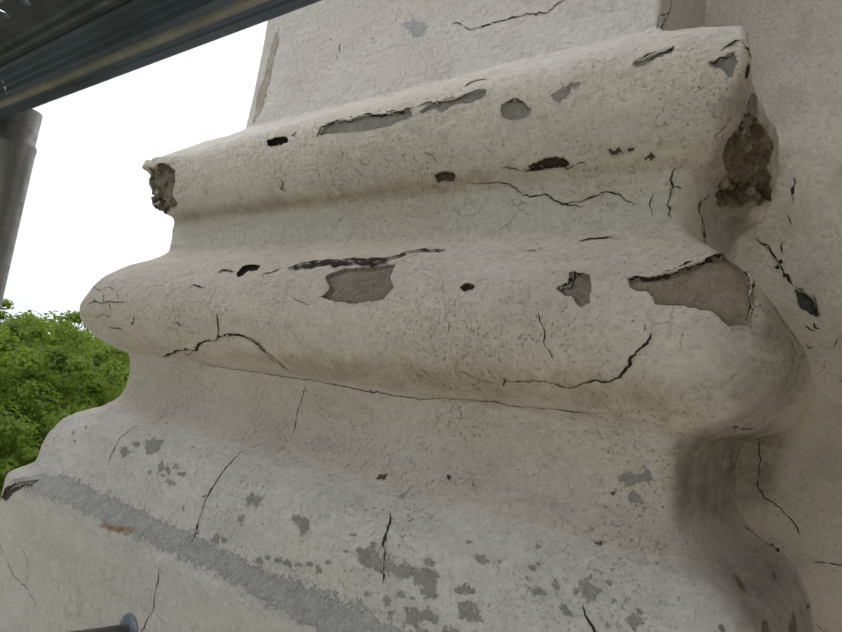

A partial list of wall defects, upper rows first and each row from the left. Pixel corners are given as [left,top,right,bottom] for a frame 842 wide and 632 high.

crack [451,0,564,30]
flaking render [316,78,486,137]
flaking render [500,98,531,120]
spalling [716,93,774,208]
spalling [149,163,178,214]
crack [472,169,682,218]
flaking render [218,248,445,304]
flaking render [557,269,591,307]
flaking render [628,252,756,326]
crack [163,313,651,436]
crack [783,323,841,381]
crack [727,416,801,537]